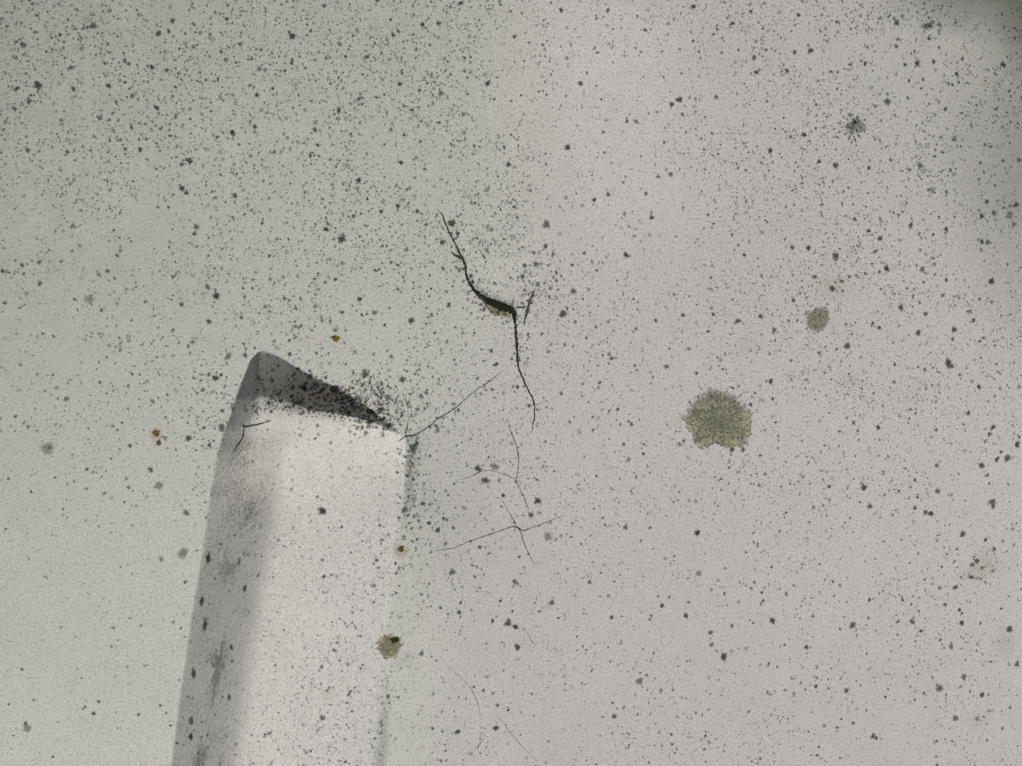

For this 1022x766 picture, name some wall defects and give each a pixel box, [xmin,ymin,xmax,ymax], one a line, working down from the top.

crack [233,421,268,452]
crack [400,210,562,565]